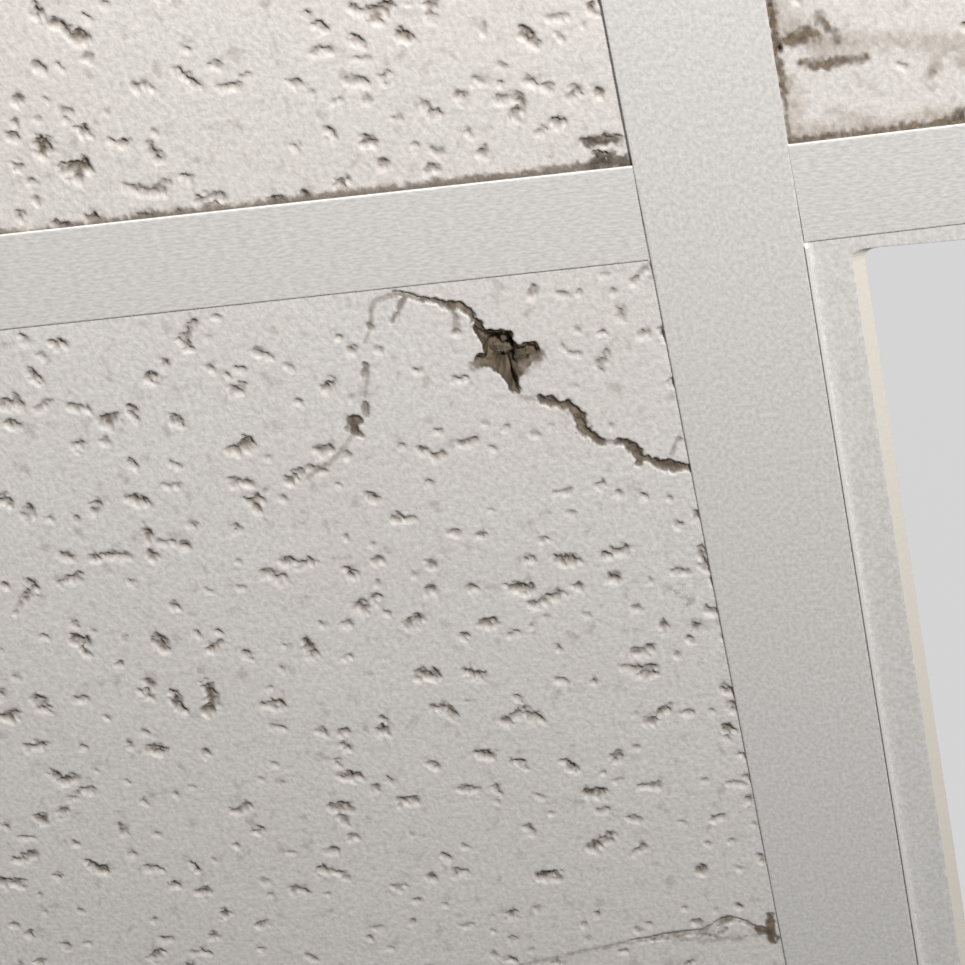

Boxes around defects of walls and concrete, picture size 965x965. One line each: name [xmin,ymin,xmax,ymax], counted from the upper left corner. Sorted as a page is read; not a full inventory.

crack [392,292,487,337]
crack [348,402,368,436]
crack [537,395,691,472]
crack [651,918,731,940]